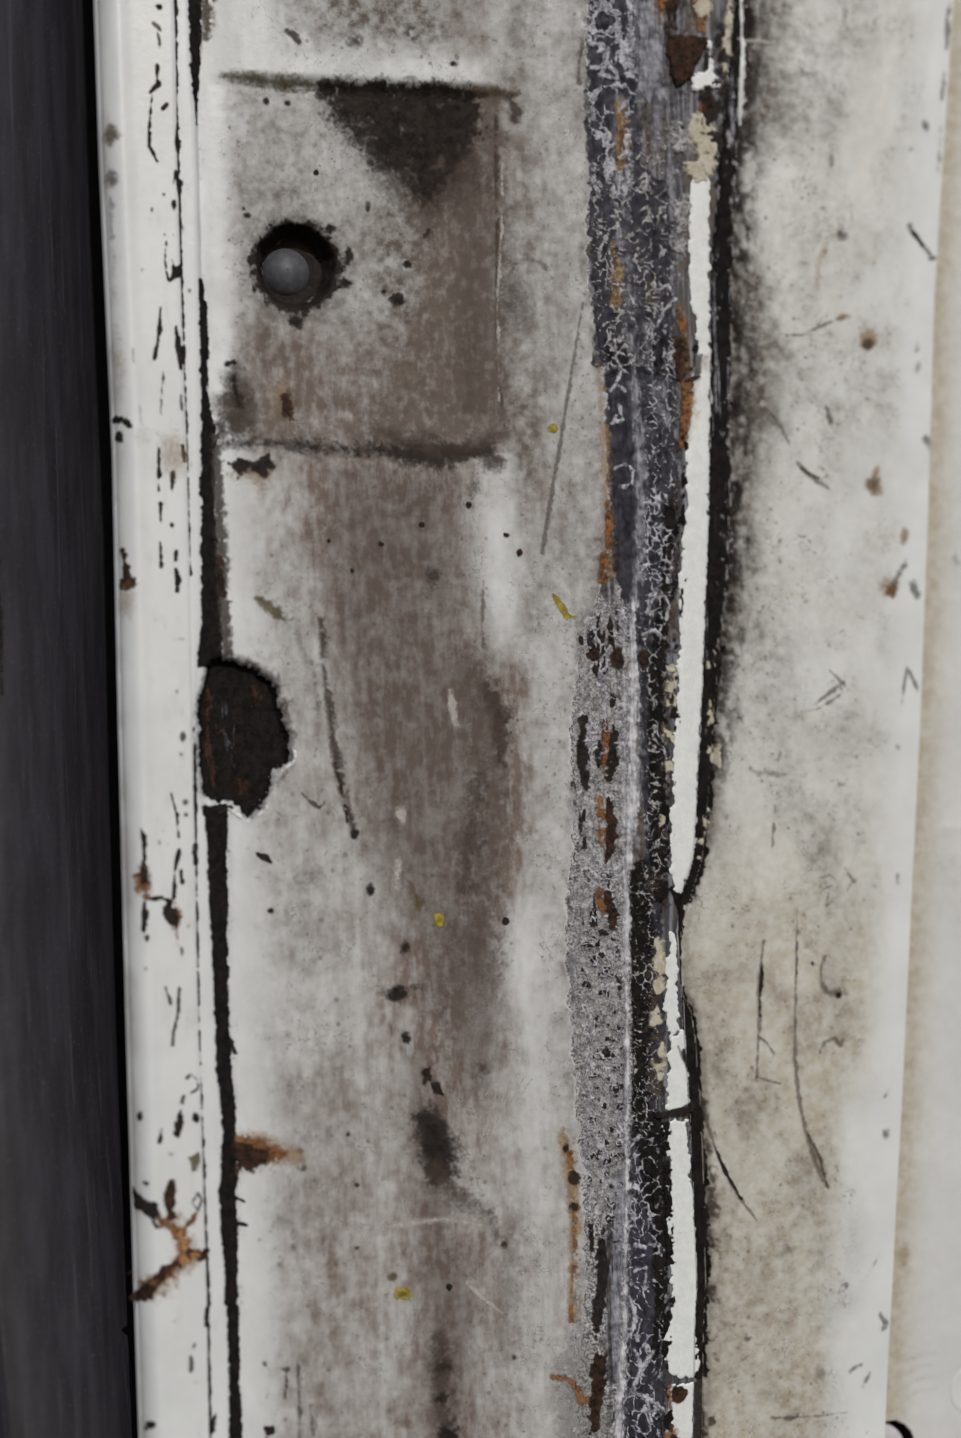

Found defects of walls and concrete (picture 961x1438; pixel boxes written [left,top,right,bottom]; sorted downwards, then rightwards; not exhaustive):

rust [655,0,708,86]
spalling [148,63,169,162]
leakage [223,72,522,213]
spalling [153,307,186,407]
spalling [157,444,186,527]
spalling [159,542,182,593]
spalling [141,657,297,941]
rust [576,715,619,863]
spalling [158,1074,200,1144]
rust [234,1135,306,1173]
rust [130,1179,210,1302]
rust [551,1128,617,1435]